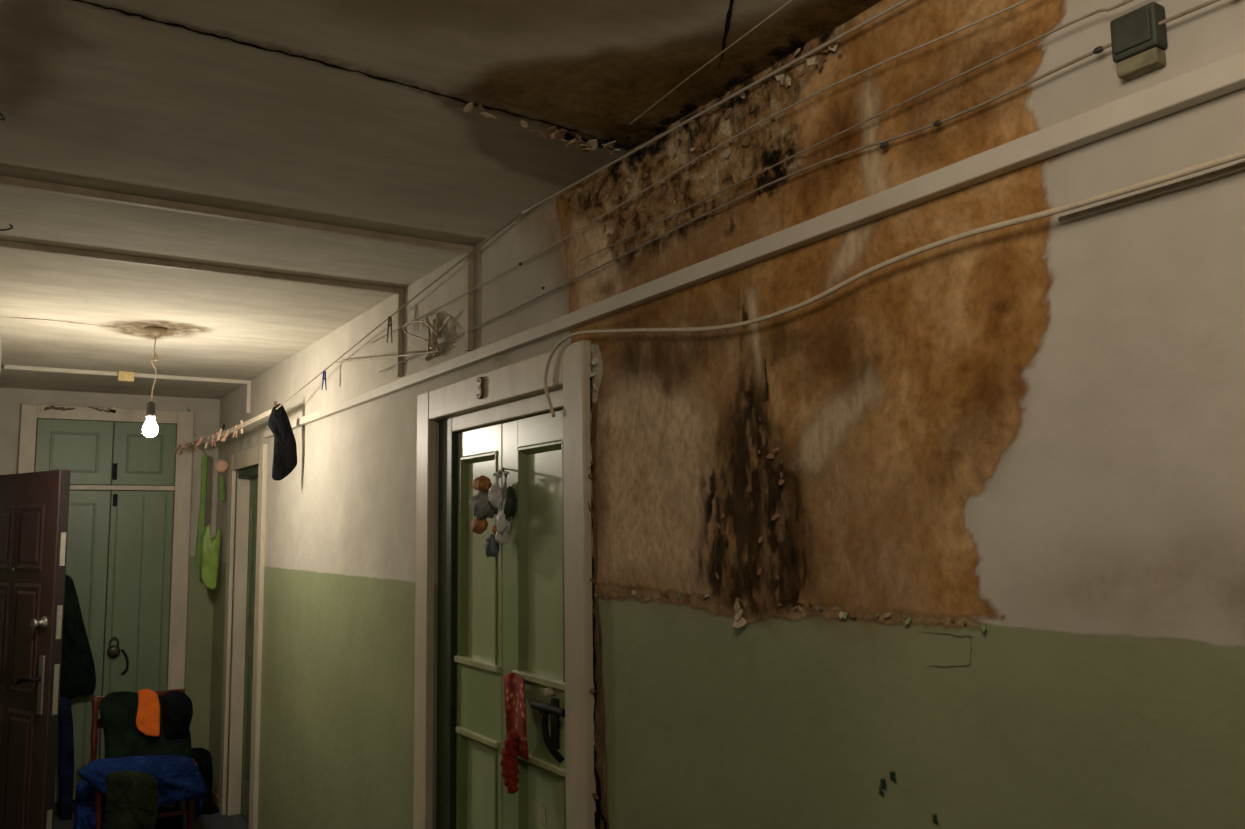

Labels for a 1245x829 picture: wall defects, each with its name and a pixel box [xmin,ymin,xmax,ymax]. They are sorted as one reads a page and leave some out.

crack [71,0,620,156]
spalling [559,28,841,266]
crack [719,0,734,69]
damp [451,0,1064,313]
damp [571,156,1055,627]